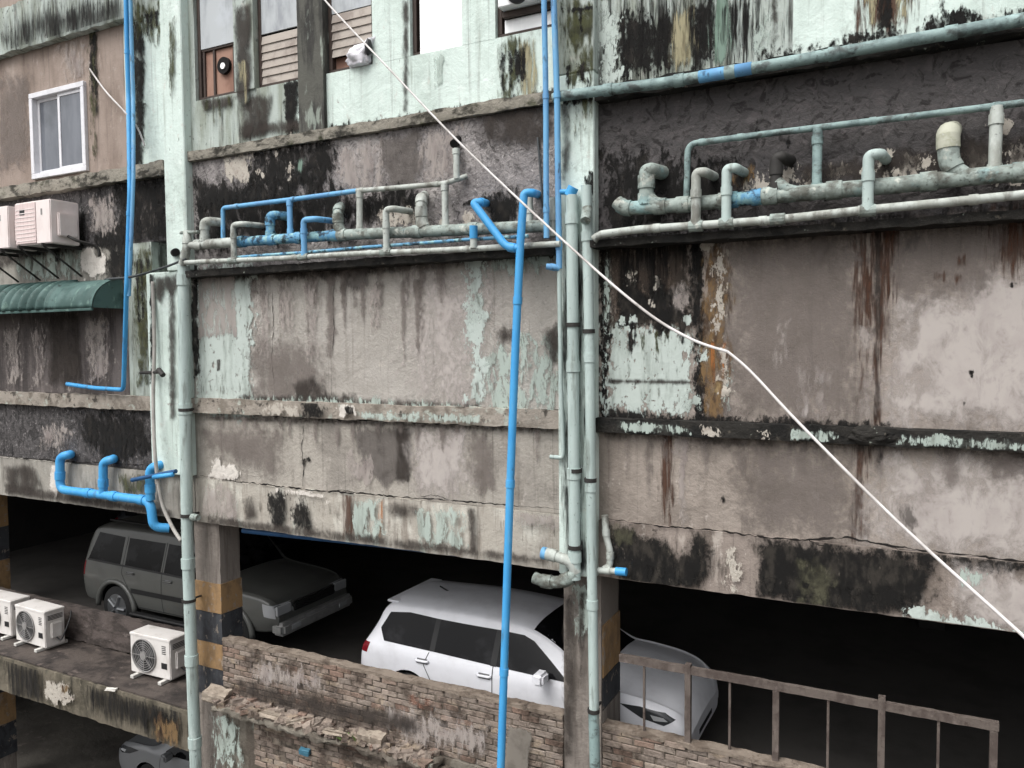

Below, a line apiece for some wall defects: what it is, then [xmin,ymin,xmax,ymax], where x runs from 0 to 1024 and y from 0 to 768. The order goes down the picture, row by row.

damp [483,0,1024,178]
damp [191,1,502,491]
peeling [194,256,559,424]
peeling [599,243,736,437]
rust [699,243,736,418]
rust [852,231,899,424]
crack [202,415,553,509]
damp [609,524,715,588]
crack [611,519,1024,562]
damp [701,438,1024,615]
peeling [898,433,1024,451]
peeling [903,605,1023,633]